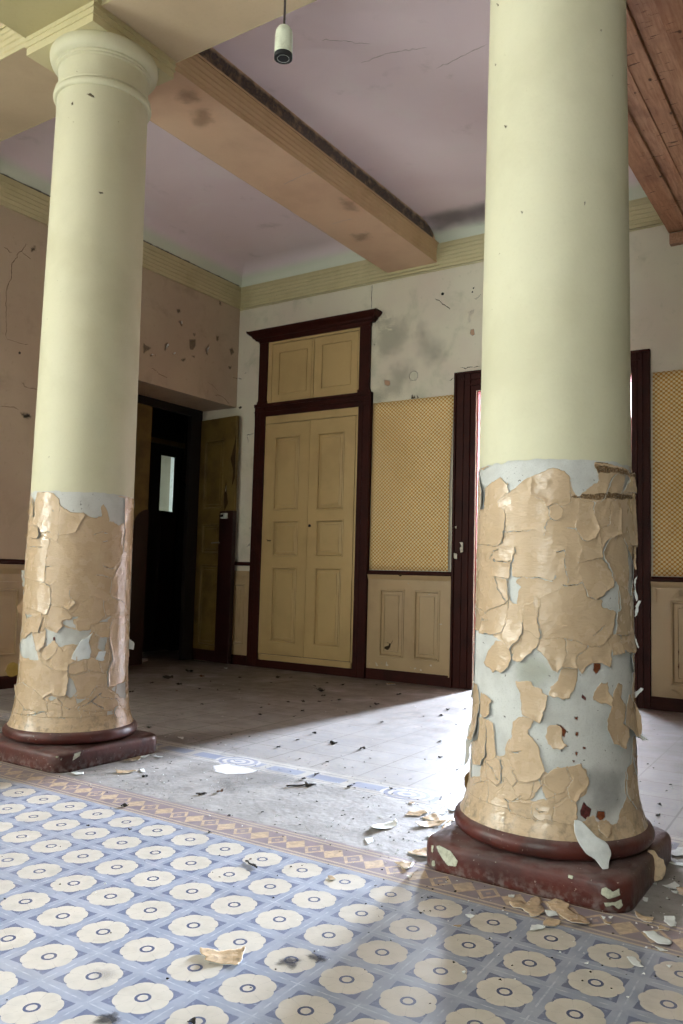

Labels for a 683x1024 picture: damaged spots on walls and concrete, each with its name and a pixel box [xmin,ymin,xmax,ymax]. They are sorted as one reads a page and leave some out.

peeling [5,492,134,733]
peeling [394,462,648,878]